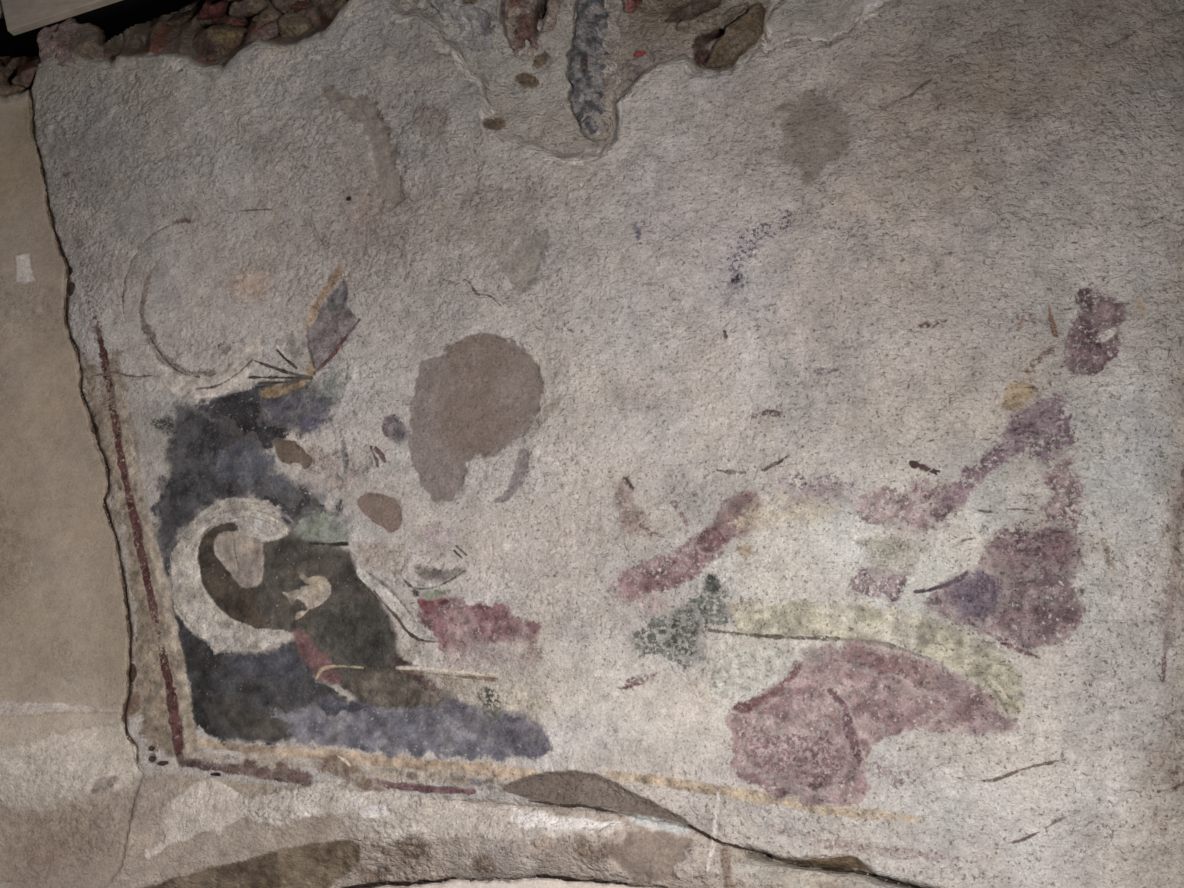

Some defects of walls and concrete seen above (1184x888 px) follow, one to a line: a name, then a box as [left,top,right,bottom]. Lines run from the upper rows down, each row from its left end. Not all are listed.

spalling [343,0,365,18]
spalling [136,51,224,74]
flaking render [389,0,903,168]
crack [686,823,933,888]